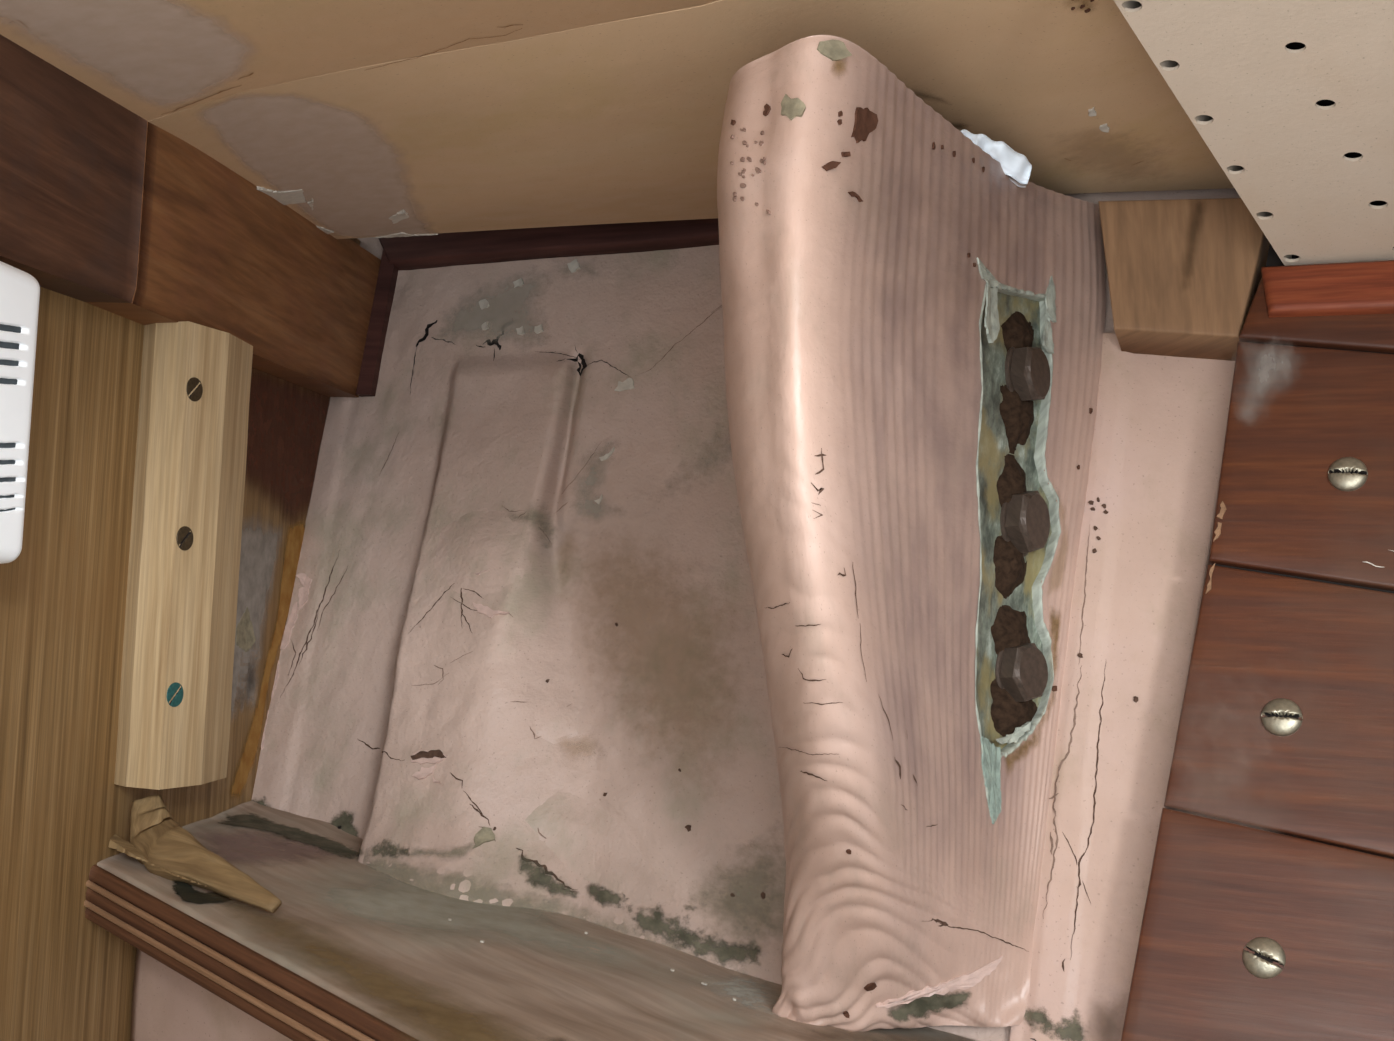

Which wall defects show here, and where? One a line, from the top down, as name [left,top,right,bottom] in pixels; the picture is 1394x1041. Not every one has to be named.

peeling [257,186,334,234]
peeling [375,210,438,238]
crack [410,318,513,393]
corrosion [1001,311,1034,352]
corrosion [996,385,1034,507]
peeling [975,258,1061,821]
corrosion [991,535,1031,655]
corrosion [990,679,1038,766]
crack [1043,526,1106,971]
damp [213,800,627,945]
damp [633,907,760,964]
crack [930,918,1024,949]